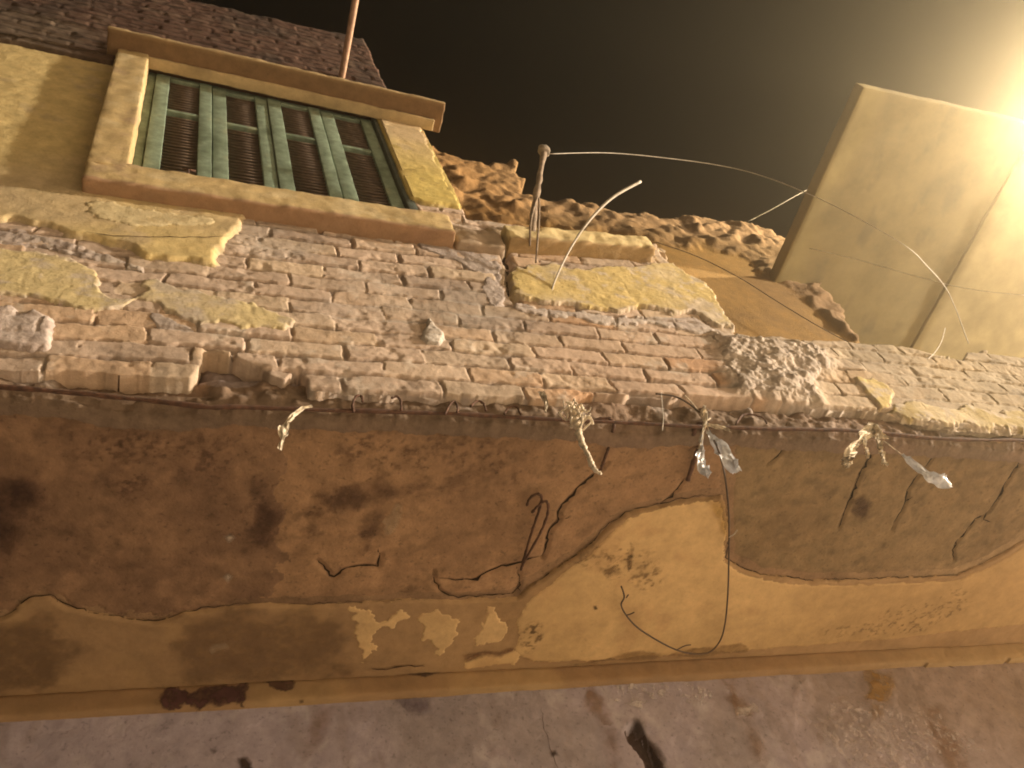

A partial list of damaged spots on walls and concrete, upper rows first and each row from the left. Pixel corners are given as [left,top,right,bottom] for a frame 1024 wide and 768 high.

flaking render [0,248,296,330]
flaking render [505,247,735,333]
spalling [198,371,260,388]
spalling [0,384,570,422]
flaking render [854,376,1024,442]
spalling [584,413,860,482]
crack [278,455,1019,605]
crack [2,594,251,621]
peeling [348,601,460,663]
peeling [464,492,1024,669]